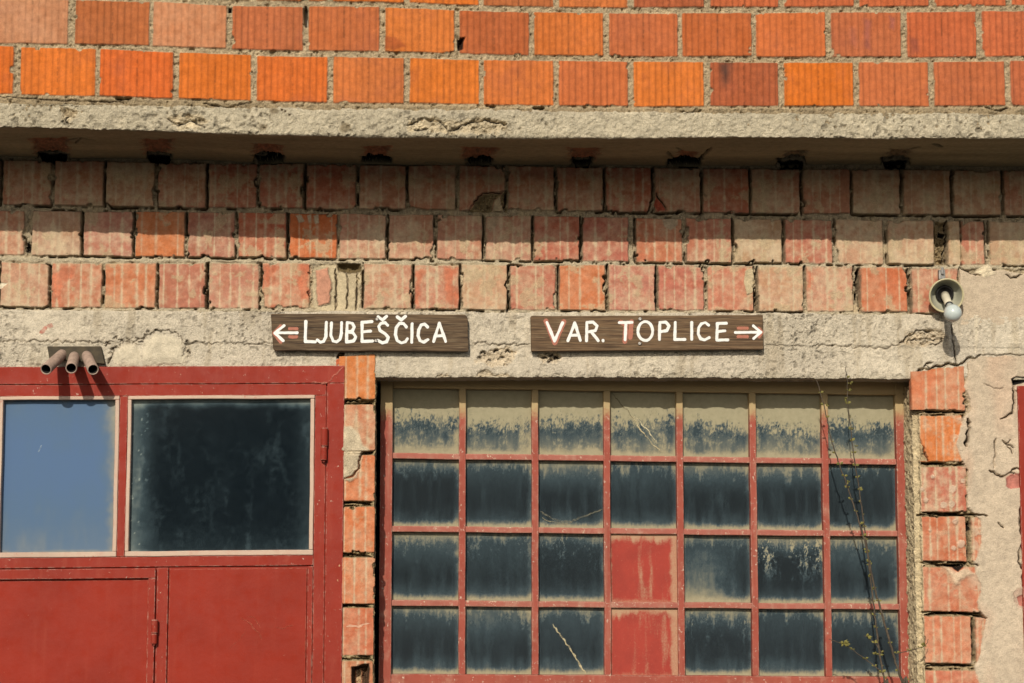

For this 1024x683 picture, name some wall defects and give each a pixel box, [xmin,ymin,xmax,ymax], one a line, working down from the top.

peeling [342,424,374,483]
crack [917,324,1024,478]